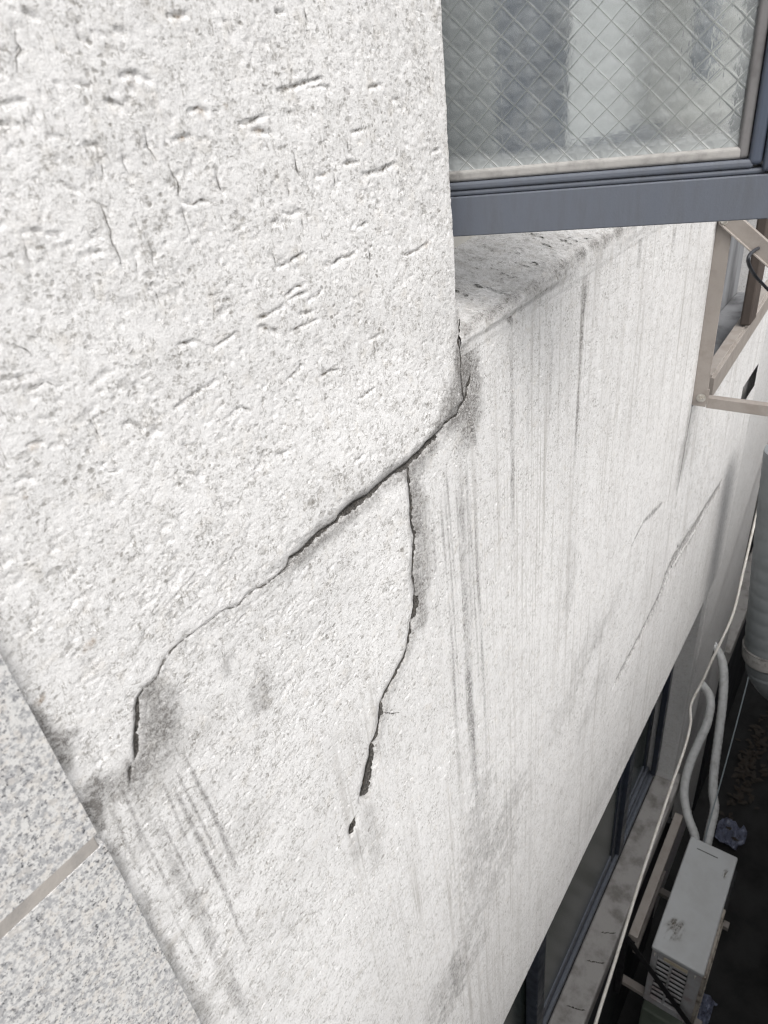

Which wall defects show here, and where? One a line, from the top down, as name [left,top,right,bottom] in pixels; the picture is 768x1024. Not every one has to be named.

crack [128,319,471,783]